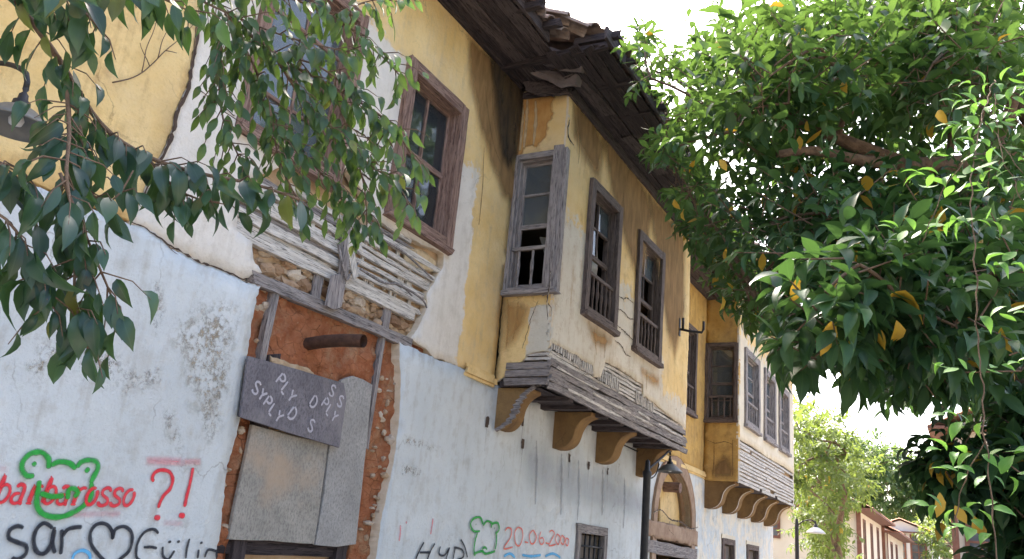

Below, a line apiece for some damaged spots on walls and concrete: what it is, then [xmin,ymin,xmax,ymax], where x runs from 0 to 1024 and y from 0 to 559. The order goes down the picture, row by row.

peeling [517,96,555,155]
mould [182,310,227,418]
flaking render [237,168,441,559]
crack [522,271,552,348]
flaking render [216,418,250,559]